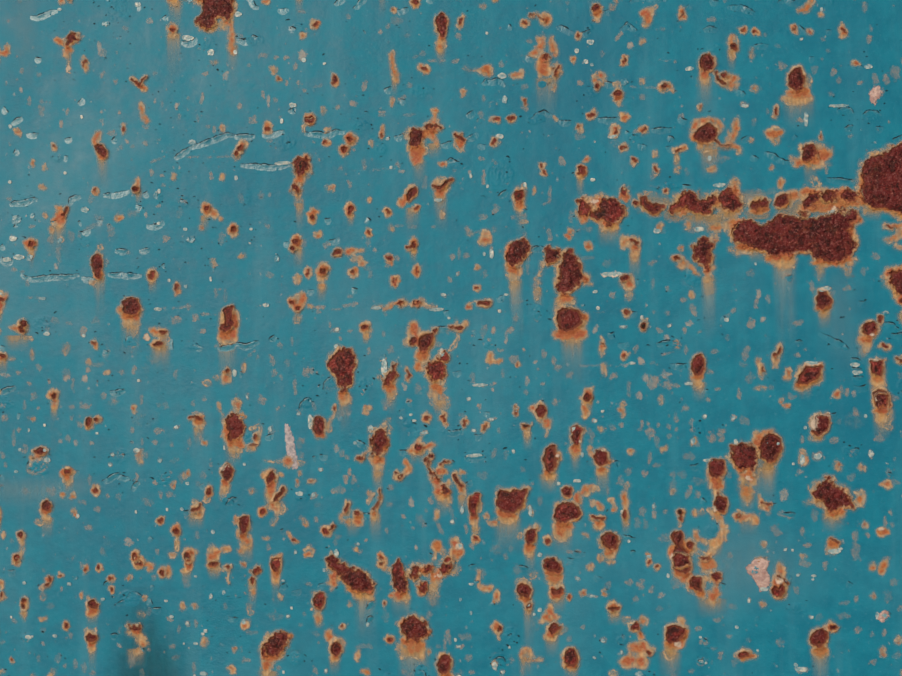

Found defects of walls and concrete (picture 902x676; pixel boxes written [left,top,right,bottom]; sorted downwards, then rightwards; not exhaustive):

rust [194,0,237,55]
rust [766,65,813,142]
rust [504,237,532,307]
rust [536,133,902,352]
rust [312,346,358,438]
rust [187,400,261,519]
rust [310,386,629,623]
rust [668,430,784,607]
rust [808,462,865,523]
rust [515,557,586,642]
rust [260,629,293,676]
rust [384,614,454,676]